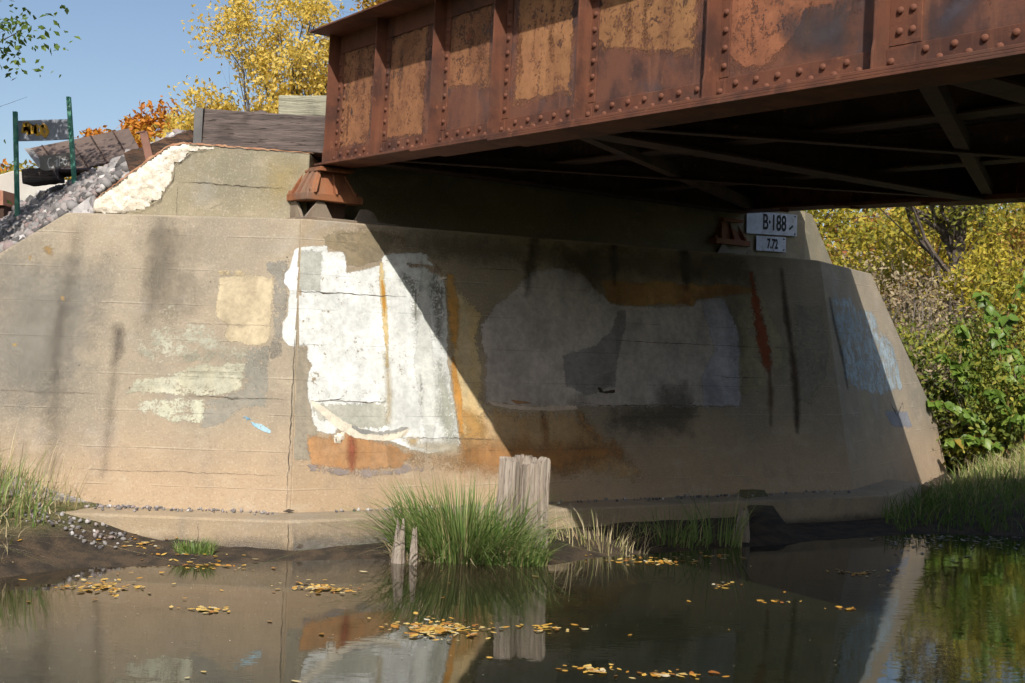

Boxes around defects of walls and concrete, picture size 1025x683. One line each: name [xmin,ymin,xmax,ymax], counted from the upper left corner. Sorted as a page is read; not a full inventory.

spalling [93,142,314,214]
peeling [126,230,461,460]
corrosion [306,262,653,486]
corrosion [600,272,773,407]